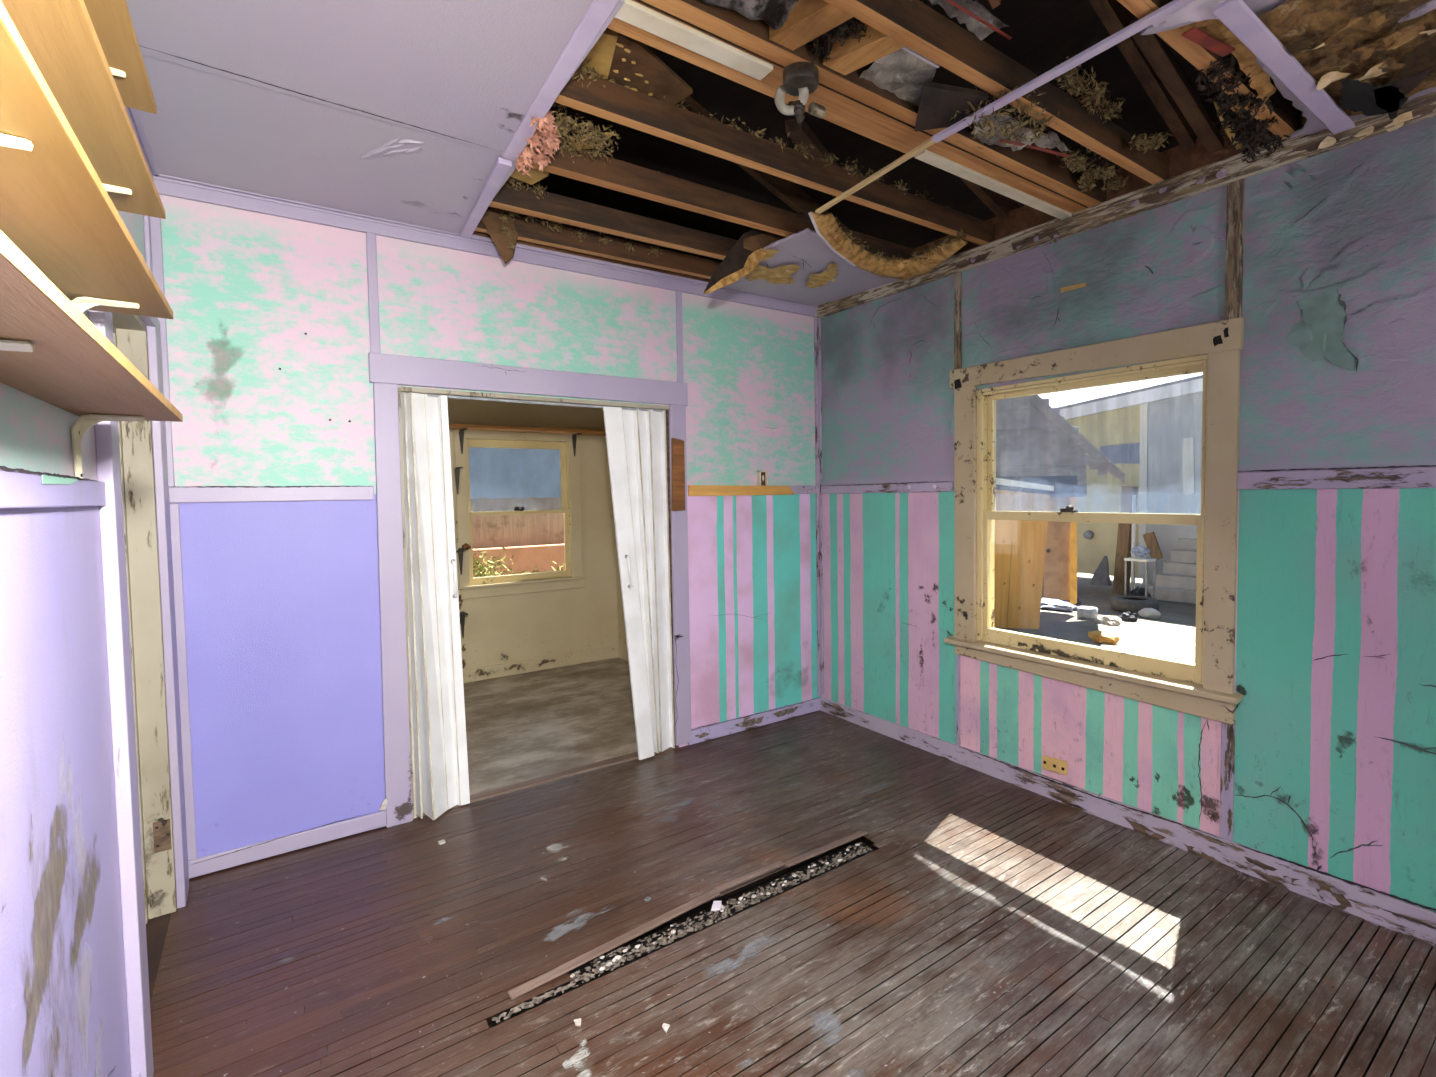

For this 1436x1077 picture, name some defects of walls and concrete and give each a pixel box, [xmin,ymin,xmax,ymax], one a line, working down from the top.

peeling [744,248,839,289]
peeling [954,251,992,269]
peeling [1011,227,1059,251]
spalling [1210,327,1229,346]
crack [962,703,1436,911]
peeling [1123,816,1221,863]
peeling [1244,856,1352,916]
damp [24,807,67,1061]
damp [72,860,99,969]